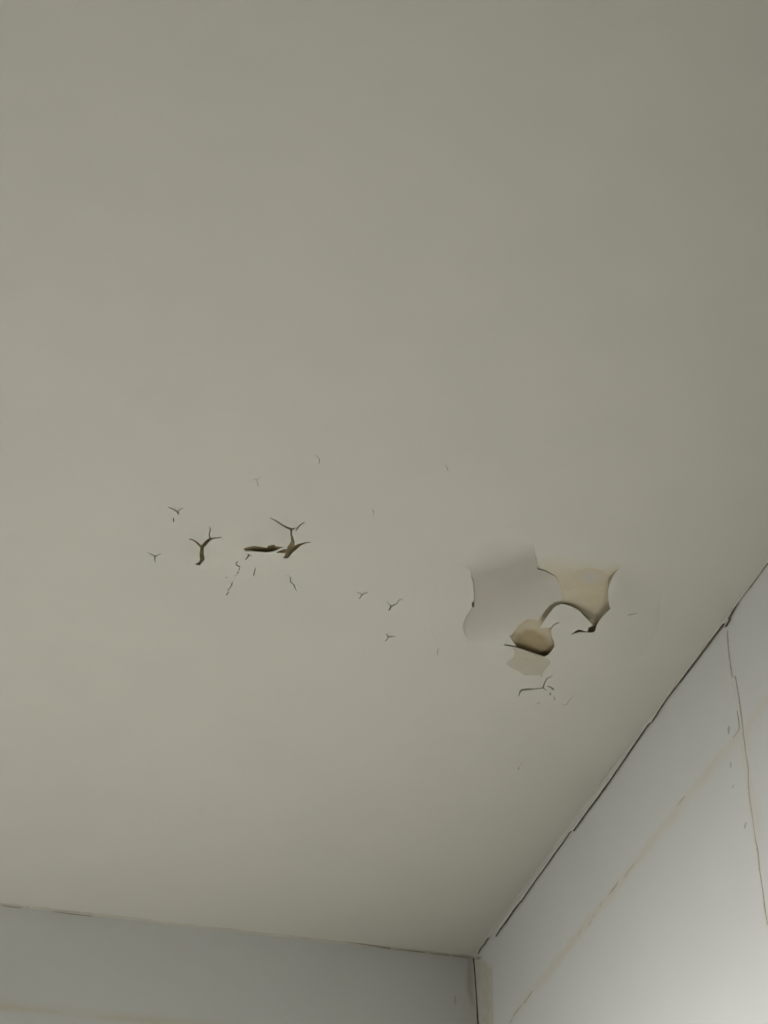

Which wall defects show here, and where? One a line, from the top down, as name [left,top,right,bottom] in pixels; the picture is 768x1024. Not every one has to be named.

crack [192,526,219,565]
crack [231,518,307,588]
peeling [429,527,661,683]
crack [350,563,768,1024]